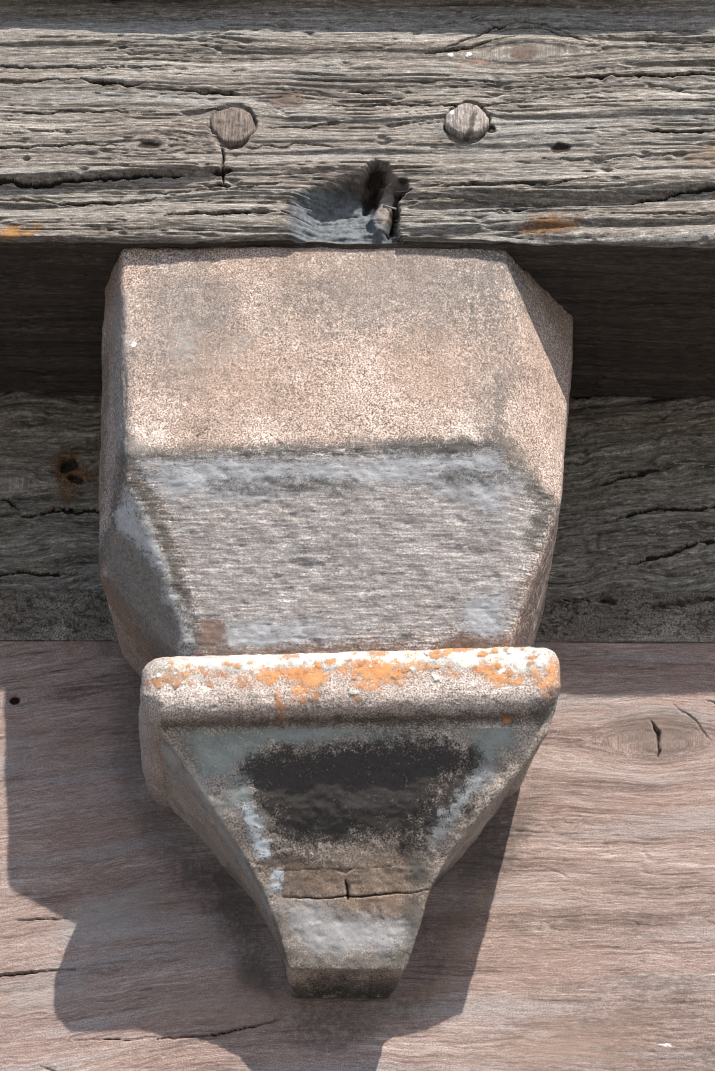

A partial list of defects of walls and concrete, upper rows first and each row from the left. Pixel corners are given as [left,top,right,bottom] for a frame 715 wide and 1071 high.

crack [290,868,411,900]
water stain [161,701,556,999]